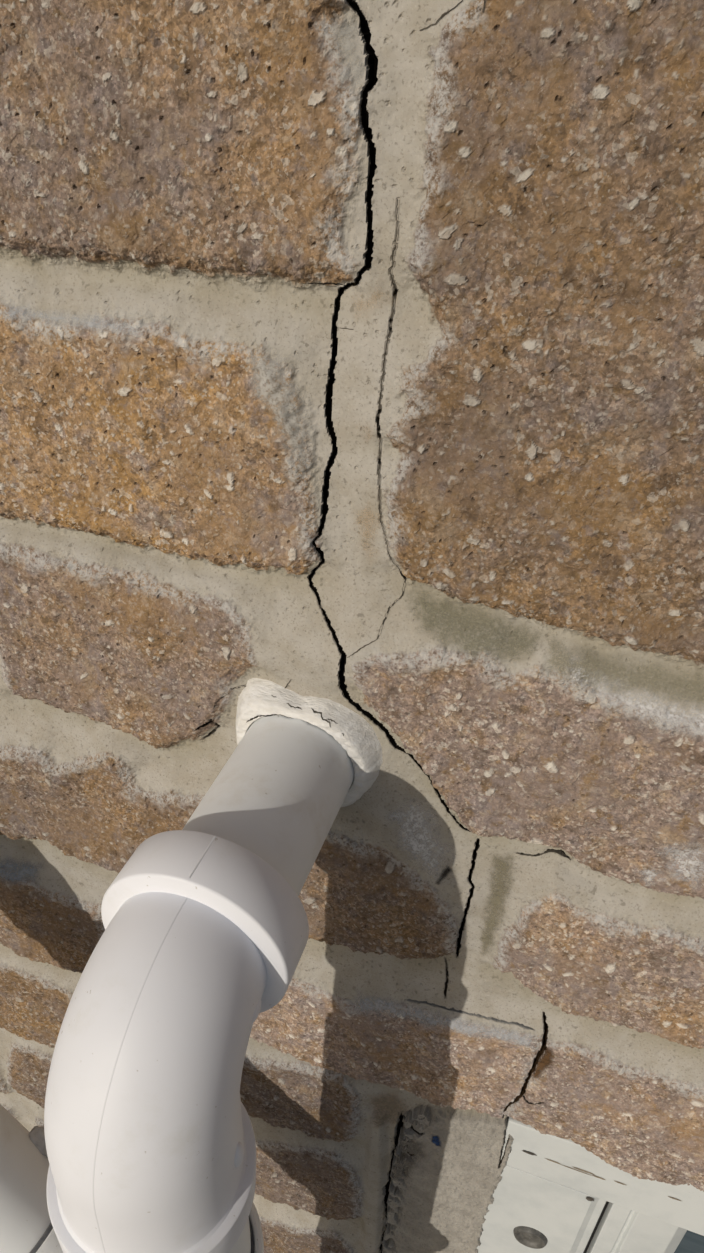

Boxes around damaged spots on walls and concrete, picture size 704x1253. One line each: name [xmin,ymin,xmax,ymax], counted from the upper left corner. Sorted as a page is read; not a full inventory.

crack [194,0,548,1168]
crack [516,849,571,860]
crack [380,1114,423,1253]